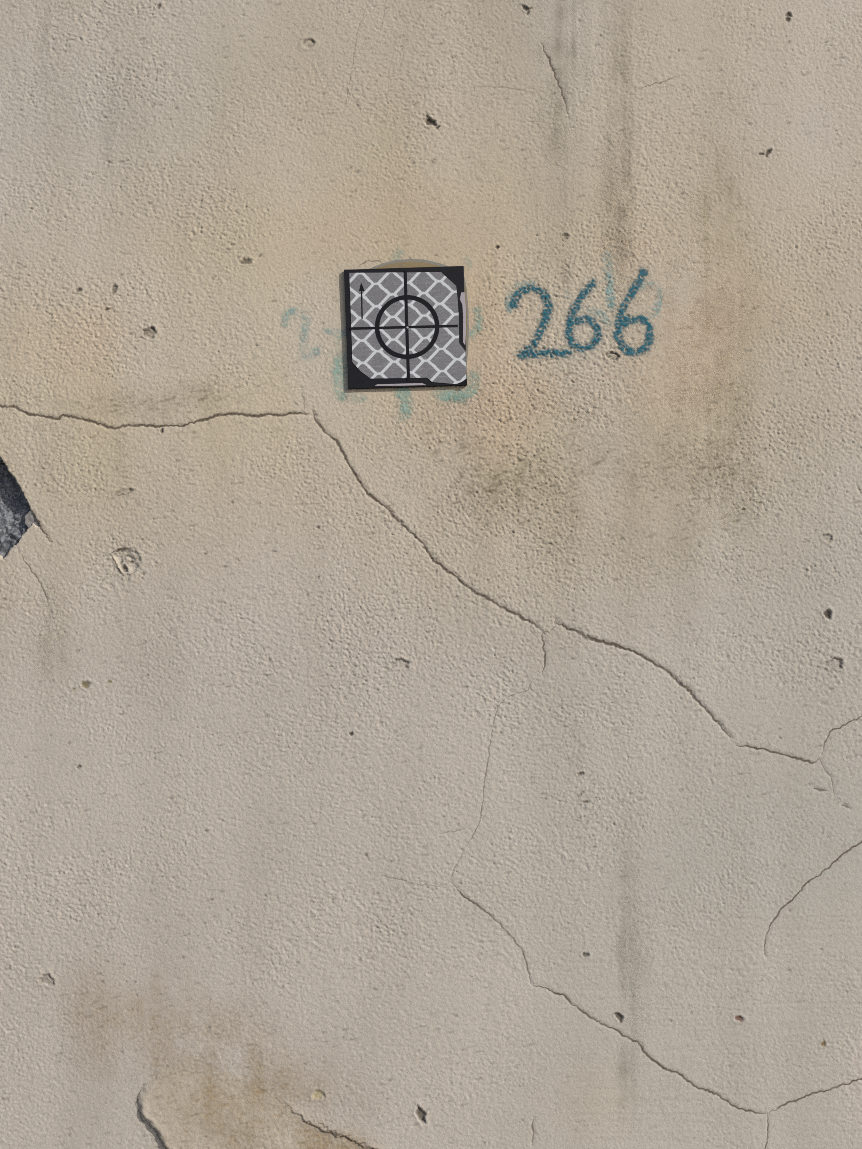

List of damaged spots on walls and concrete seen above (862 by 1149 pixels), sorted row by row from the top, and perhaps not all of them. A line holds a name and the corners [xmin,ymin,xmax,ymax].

spalling [0,457,40,557]
crack [0,405,862,807]
crack [764,842,862,947]
crack [523,952,862,1149]